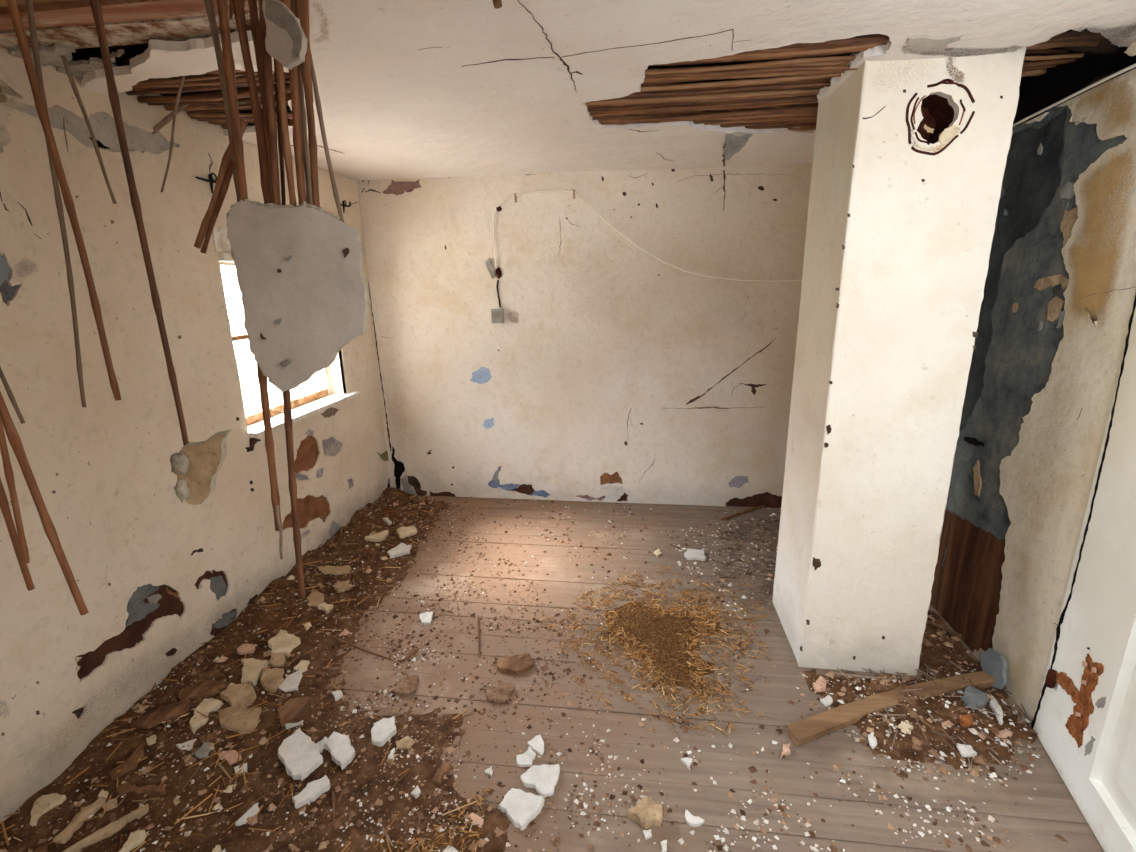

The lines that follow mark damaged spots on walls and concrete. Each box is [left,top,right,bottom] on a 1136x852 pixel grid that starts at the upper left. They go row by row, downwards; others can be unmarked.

crack [462,0,749,90]
peeling [16,105,177,154]
peeling [0,253,20,305]
peeling [942,105,1127,567]
crack [666,328,777,409]
flaking render [294,435,320,473]
flaking render [282,495,330,531]
peeling [488,465,551,500]
peeling [564,471,628,502]
flaking render [725,476,782,508]
flaking render [195,570,228,599]
flaking render [75,583,184,679]